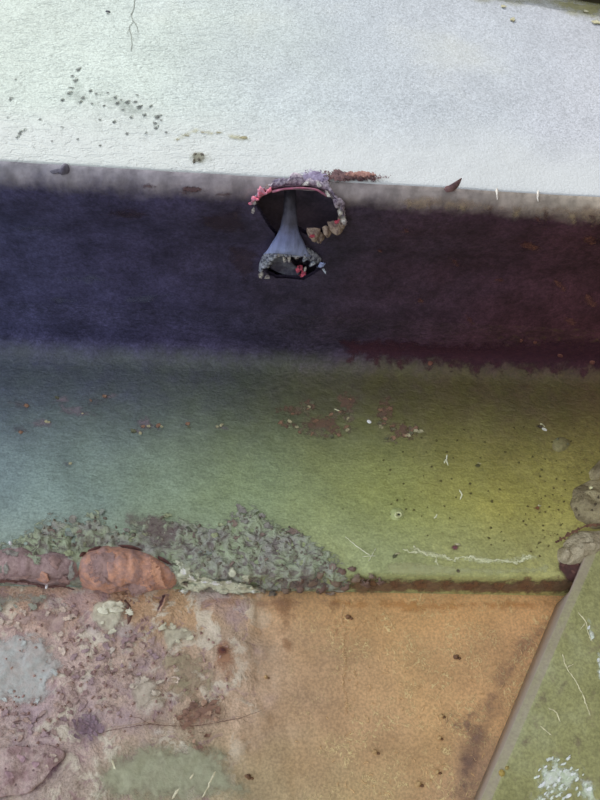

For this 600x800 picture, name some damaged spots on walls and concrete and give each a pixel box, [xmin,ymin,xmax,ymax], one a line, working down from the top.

crack [100,708,262,734]